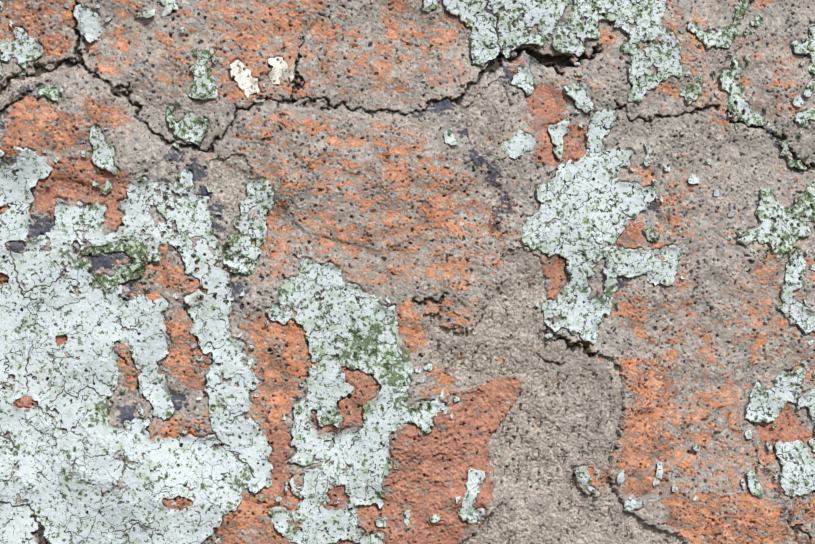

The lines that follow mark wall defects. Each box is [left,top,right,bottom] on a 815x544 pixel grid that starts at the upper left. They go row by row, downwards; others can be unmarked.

peeling [160,43,294,156]
crack [0,0,601,153]
crack [614,100,815,172]
peeling [780,24,815,170]
crack [8,245,62,318]
spalling [257,0,776,544]
peeling [724,180,815,345]
crack [25,341,106,414]
crack [71,446,135,470]
crack [214,411,256,478]
peeling [766,431,815,497]
crack [0,501,47,544]